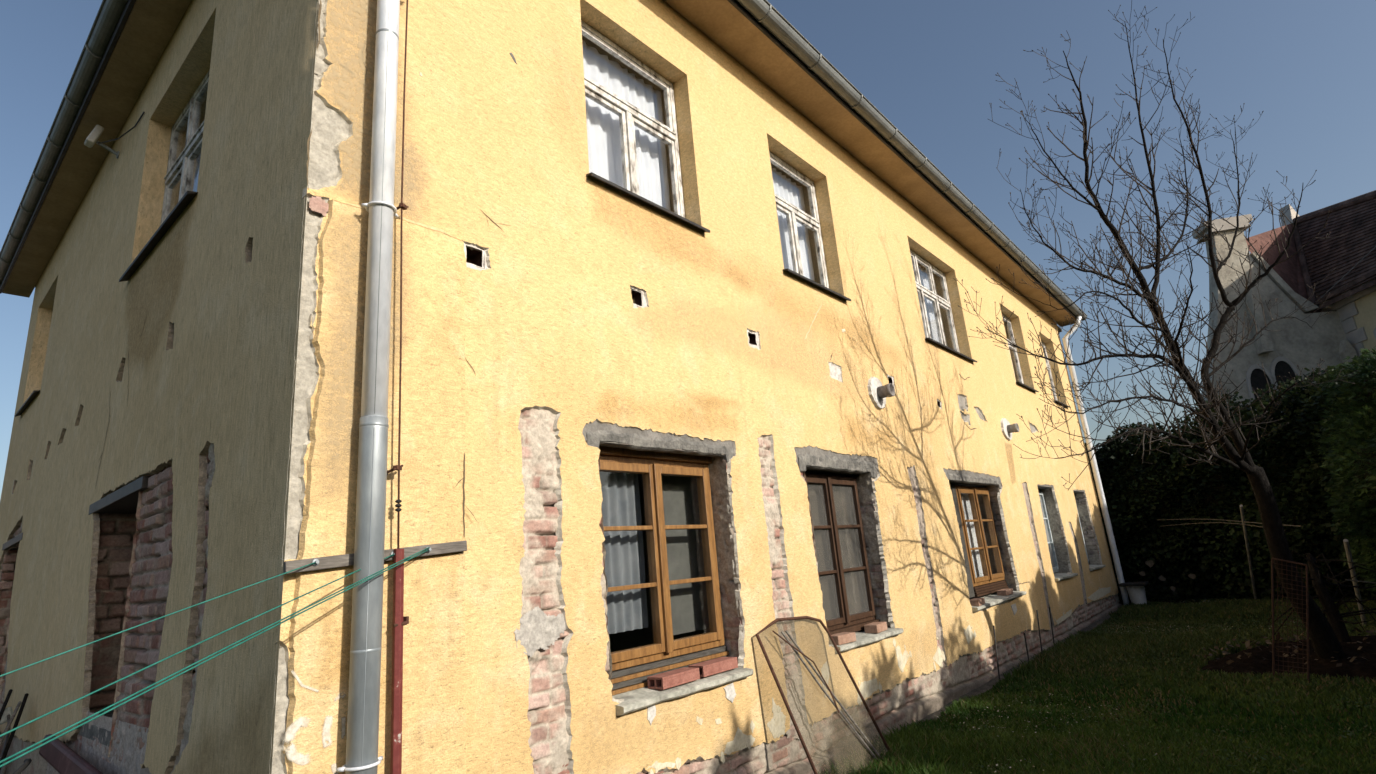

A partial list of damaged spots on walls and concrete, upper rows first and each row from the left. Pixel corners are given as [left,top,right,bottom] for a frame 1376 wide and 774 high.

spalling [245,237,253,263]
flaking render [282,0,353,565]
flaking render [0,516,23,609]
flaking render [0,731,60,774]
flaking render [62,441,215,774]
flaking render [514,405,574,774]
flaking render [582,419,745,680]
flaking render [637,434,1122,774]